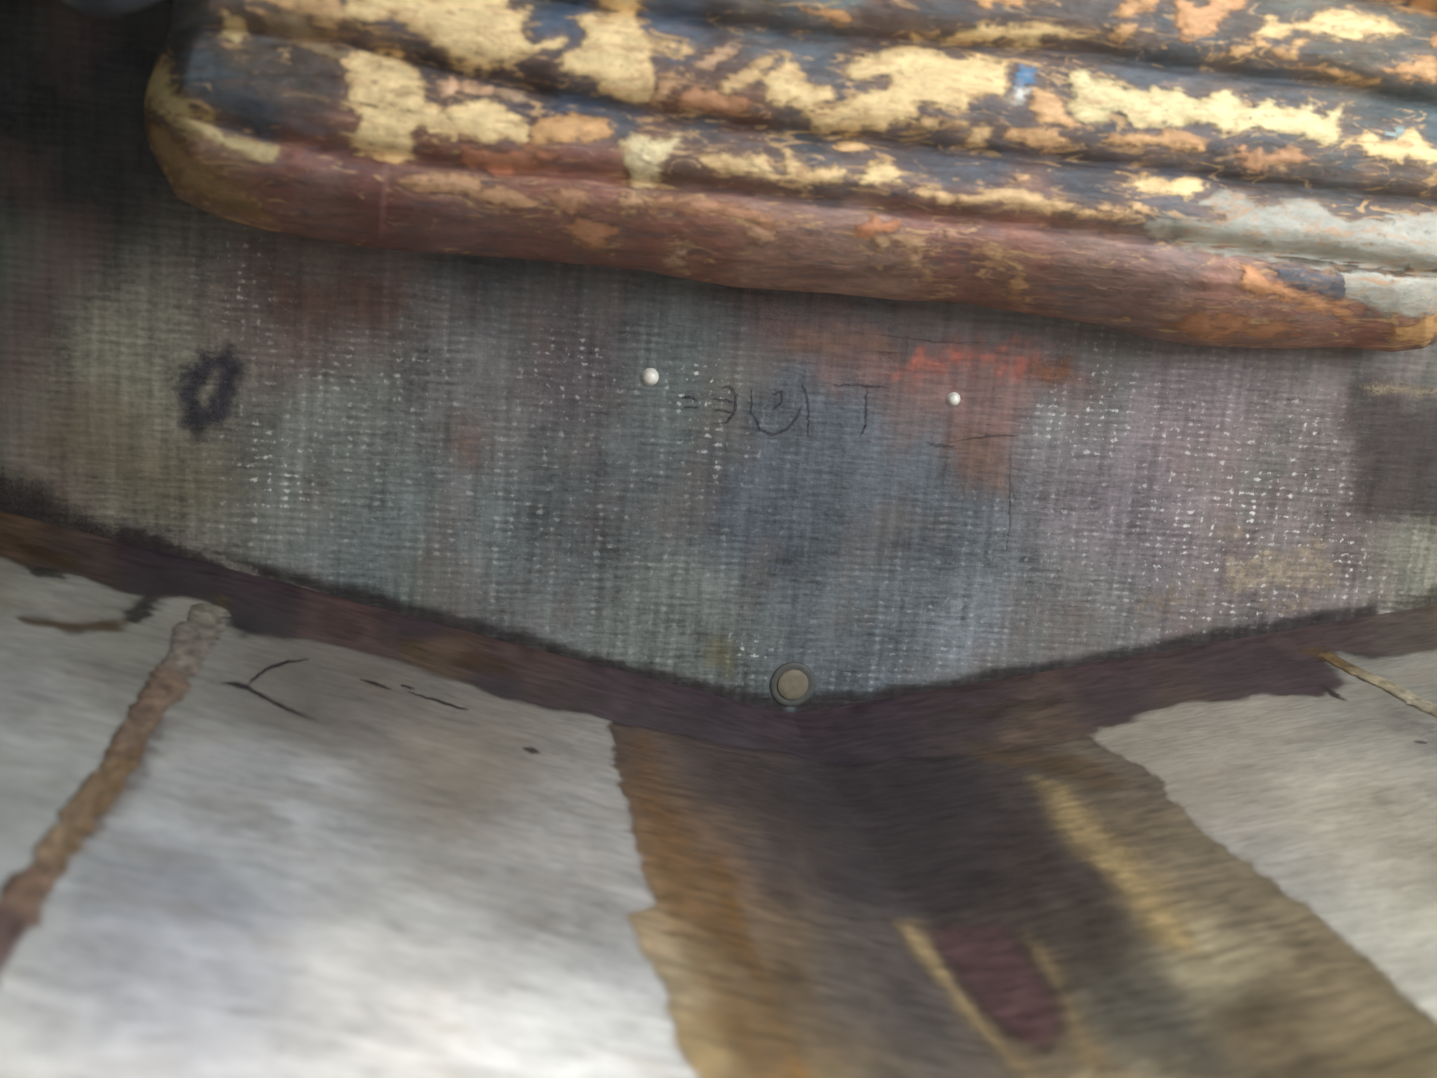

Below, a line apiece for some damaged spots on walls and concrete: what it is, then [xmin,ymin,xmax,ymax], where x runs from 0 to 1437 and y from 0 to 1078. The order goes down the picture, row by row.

peeling [144,56,282,166]
peeling [217,0,1437,346]
corrosion [14,603,156,637]
crack [221,659,314,719]
water stain [606,687,1437,1078]